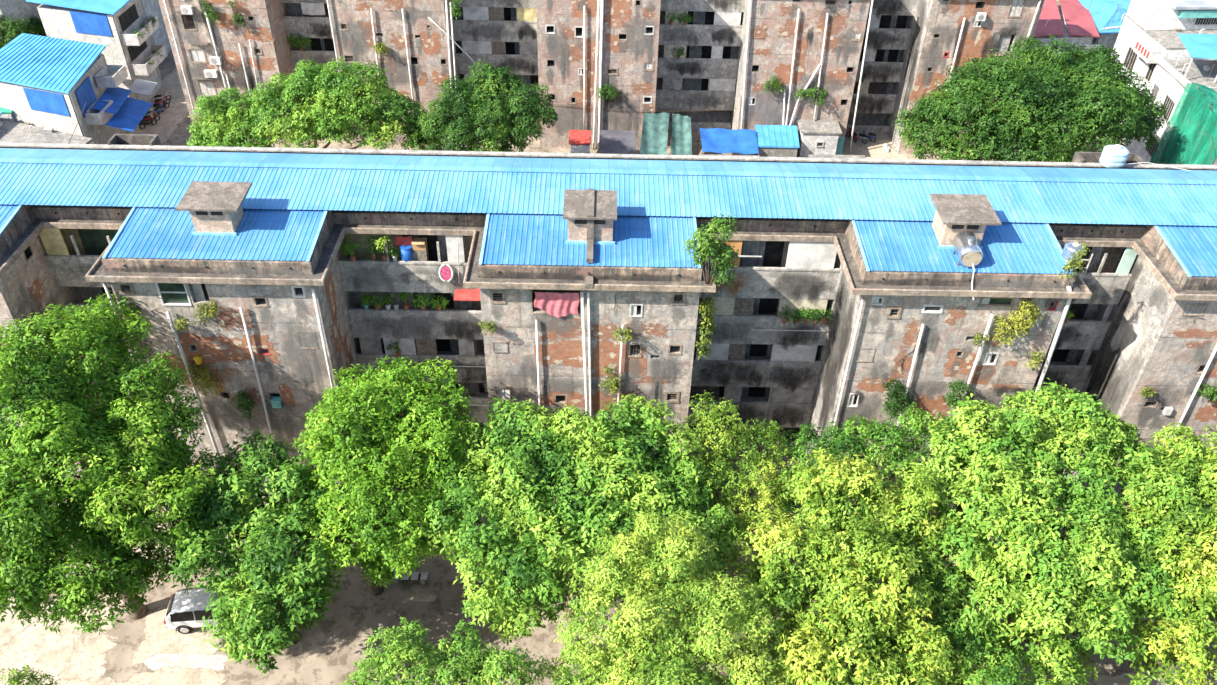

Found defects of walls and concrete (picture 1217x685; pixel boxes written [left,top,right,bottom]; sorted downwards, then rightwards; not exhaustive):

flaking render [559,0,656,115]
leakage [670,62,700,76]
leakage [712,29,735,45]
flaking render [750,3,849,92]
leakage [804,0,1027,118]
flaking render [908,0,997,103]
flaking render [154,307,281,379]
flaking render [534,315,676,413]
leakage [701,271,968,436]
flaking render [942,334,1024,390]
leakage [966,366,1068,414]
leakage [981,281,1081,352]